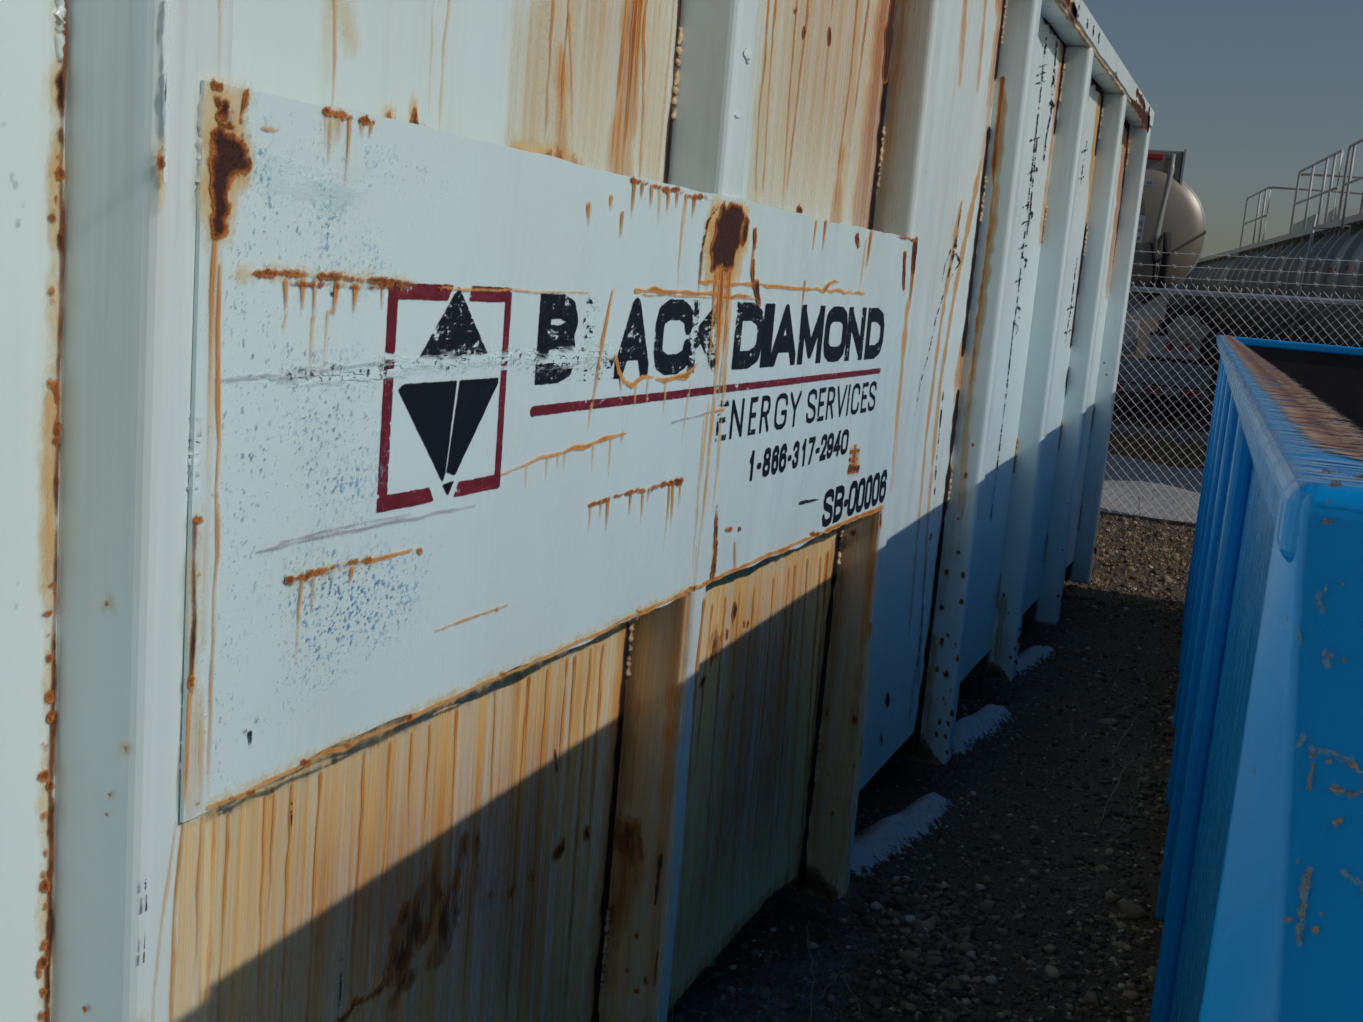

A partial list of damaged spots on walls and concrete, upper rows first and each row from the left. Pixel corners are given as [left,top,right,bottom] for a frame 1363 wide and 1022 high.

corrosion [514,0,578,164]
corrosion [610,0,648,168]
corrosion [756,0,777,169]
corrosion [785,0,810,171]
corrosion [924,0,1007,471]
corrosion [47,378,62,446]
corrosion [184,78,884,1022]
corrosion [903,632,959,767]